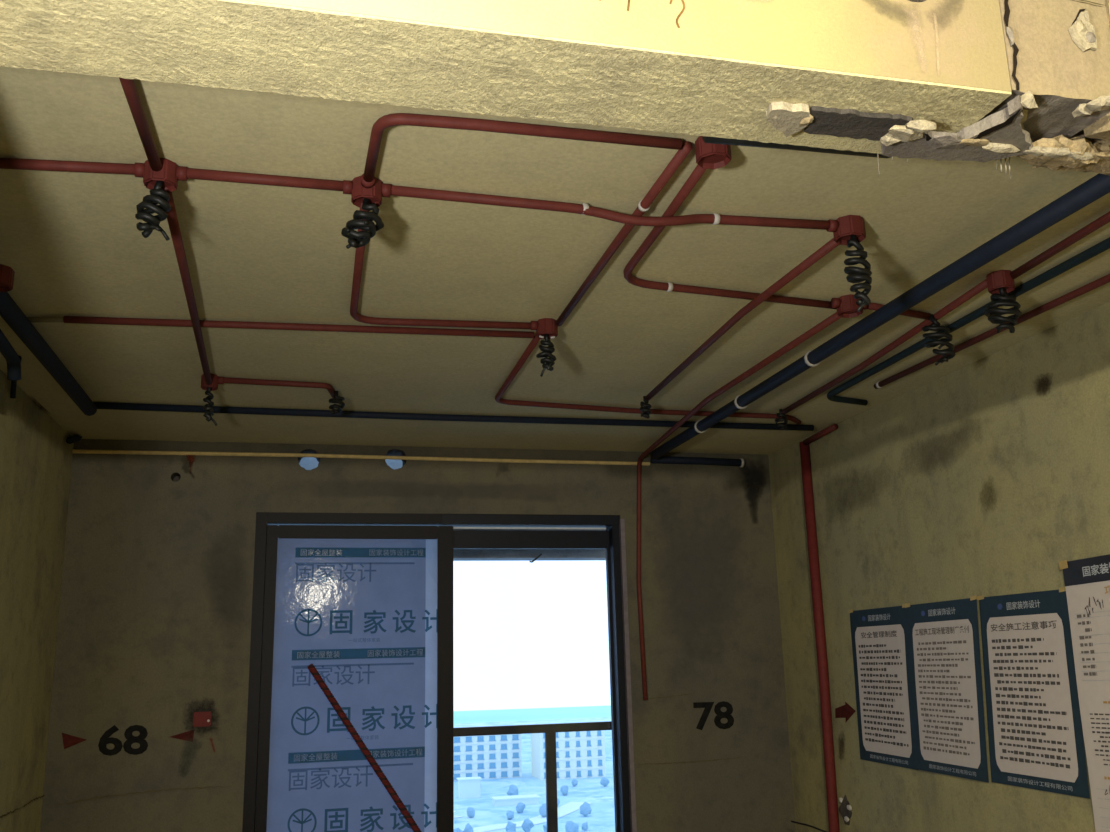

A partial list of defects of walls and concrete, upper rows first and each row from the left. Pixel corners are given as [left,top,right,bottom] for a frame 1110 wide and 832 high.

crack [968,0,1021,146]
spalling [766,91,1110,175]
leakage [742,466,765,522]